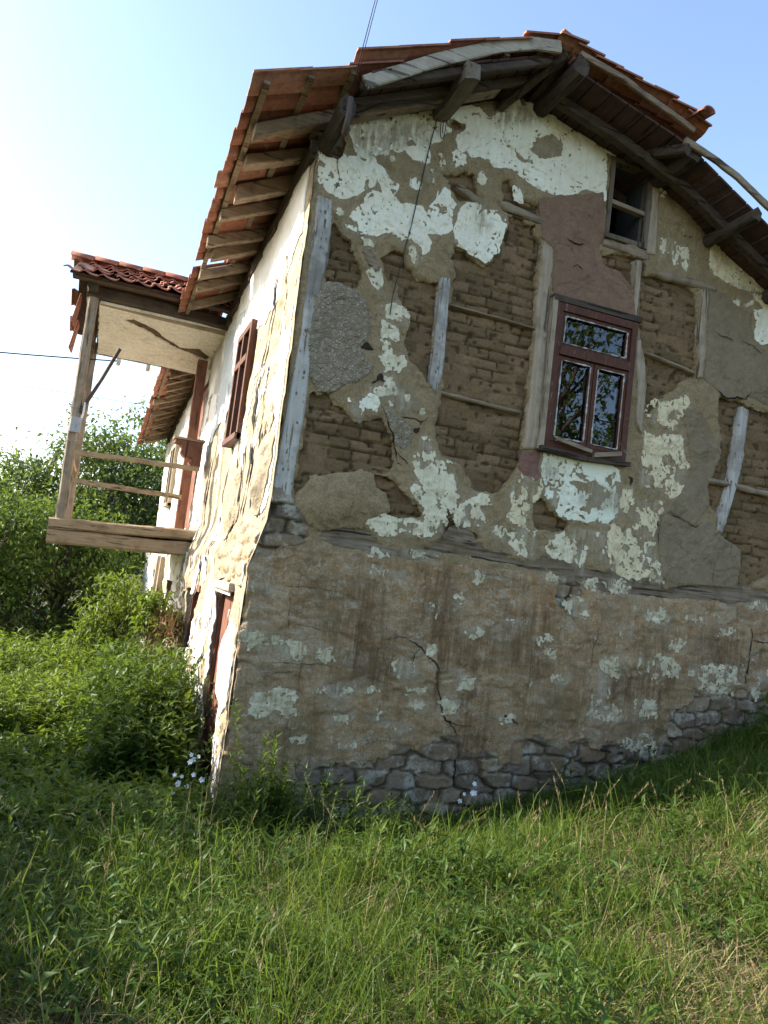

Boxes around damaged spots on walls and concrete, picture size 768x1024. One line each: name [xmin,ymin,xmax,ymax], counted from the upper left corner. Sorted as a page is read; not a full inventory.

peeling [709,244,768,345]
spalling [127,99,696,817]
spalling [708,398,768,586]
crack [387,632,472,789]
spalling [295,639,768,832]